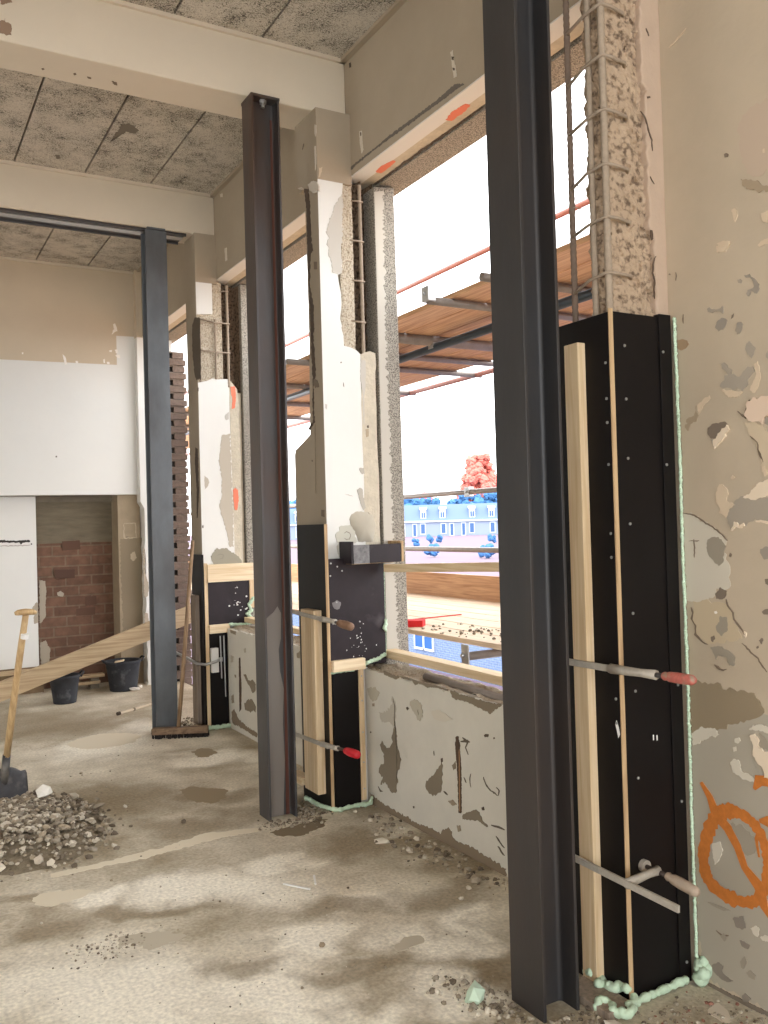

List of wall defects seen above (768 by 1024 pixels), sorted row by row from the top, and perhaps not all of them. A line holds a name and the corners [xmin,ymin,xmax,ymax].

spalling [563,0,654,322]
spalling [326,181,380,545]
spalling [737,274,760,296]
flaking render [195,434,234,547]
crack [683,513,728,558]
flaking render [683,306,768,644]
leakage [179,786,228,804]
leakage [267,606,328,837]
spalling [367,687,507,876]
crack [690,607,727,671]
flaking render [687,714,768,1011]
crack [725,599,767,672]